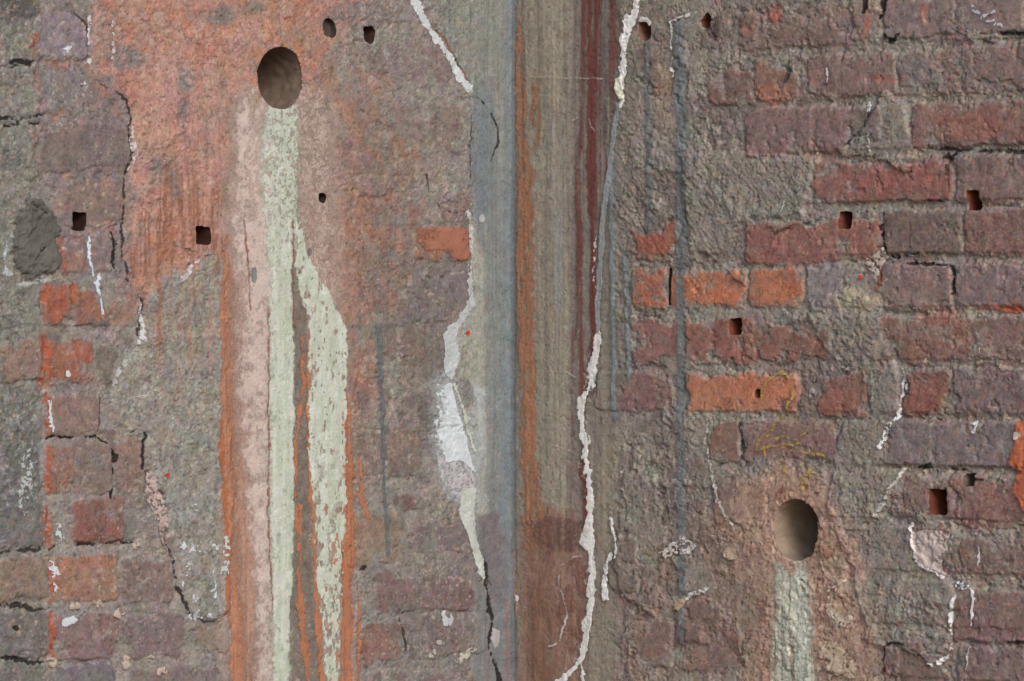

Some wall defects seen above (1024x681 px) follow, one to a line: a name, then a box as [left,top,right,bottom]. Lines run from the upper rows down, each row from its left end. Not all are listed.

crack [45,12,159,498]
crack [157,508,224,623]
leakage [231,75,348,681]
corrosion [291,219,326,681]
corrosion [340,389,370,681]
peeling [417,209,485,579]
crack [410,0,500,177]
crack [484,559,502,681]
corrosion [514,18,562,558]
crack [548,0,641,681]
leakage [771,561,815,681]
spalling [908,522,950,580]